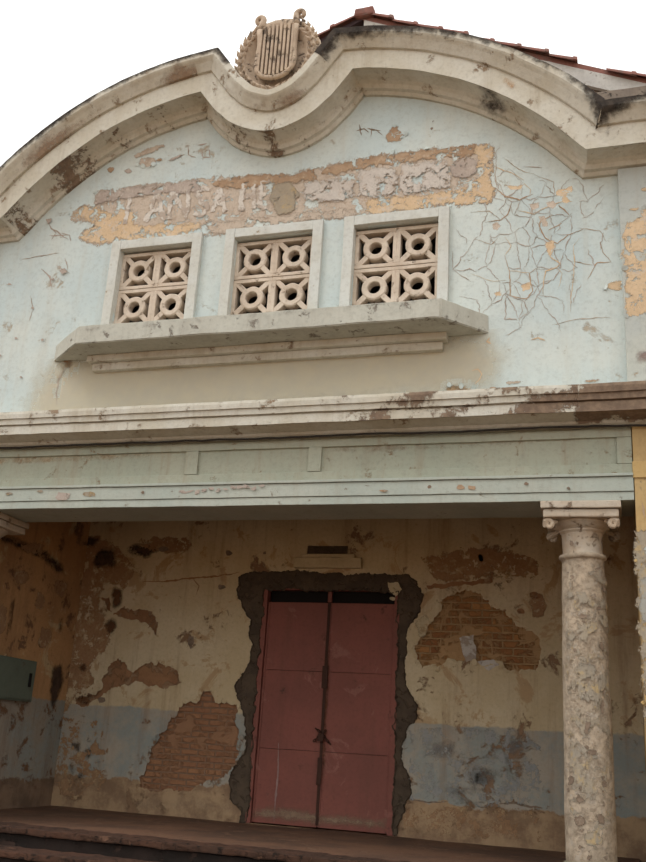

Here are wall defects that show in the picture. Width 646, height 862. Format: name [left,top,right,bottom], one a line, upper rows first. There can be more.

leakage [314,25,646,129]
peeling [4,201,38,236]
peeling [50,146,114,194]
peeling [68,123,496,247]
crack [452,148,610,344]
peeling [603,204,646,318]
peeling [358,379,646,424]
peeling [54,535,184,801]
spalling [136,547,547,836]
peeling [633,530,646,724]